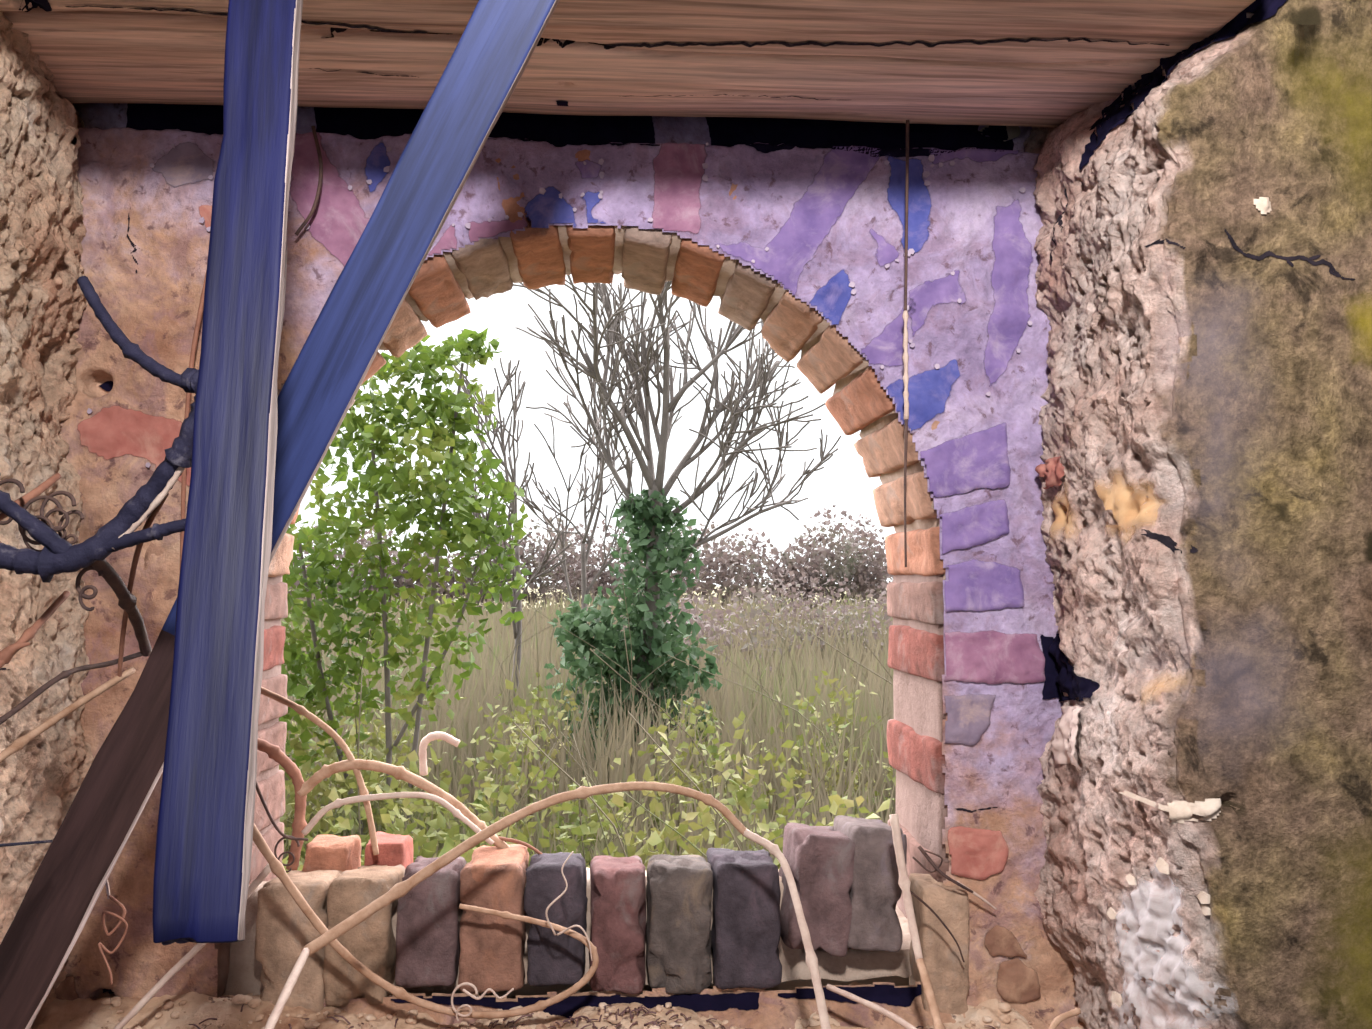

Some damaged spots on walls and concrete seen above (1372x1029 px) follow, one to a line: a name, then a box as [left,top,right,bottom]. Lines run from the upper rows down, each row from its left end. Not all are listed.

crack [65,5,228,16]
crack [301,20,452,77]
crack [537,38,1169,50]
crack [1145,238,1186,249]
crack [1224,229,1355,280]
spalling [1035,456,1065,489]
flaking render [1050,705,1083,770]
spalling [1118,790,1221,825]
water stain [1156,857,1169,874]
water stain [1197,891,1210,915]
water stain [1111,991,1124,1008]